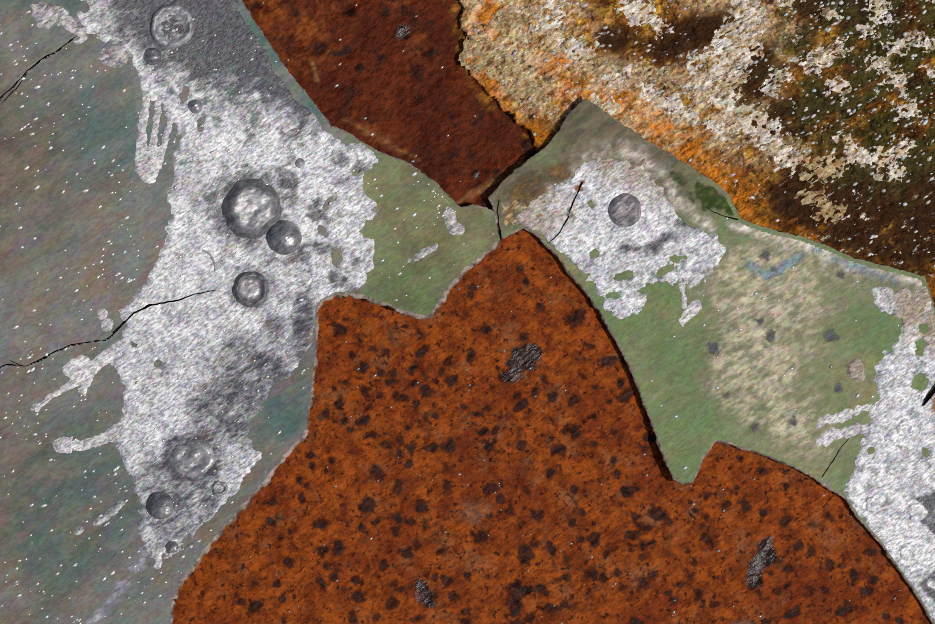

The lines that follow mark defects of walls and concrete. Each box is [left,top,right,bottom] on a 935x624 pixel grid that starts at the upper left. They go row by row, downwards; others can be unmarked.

crack [0,35,78,101]
crack [548,182,583,244]
crack [0,290,215,368]
water stain [566,143,924,461]
rust [323,345,458,468]
rust [490,333,558,412]
crack [922,387,935,406]
rust [358,497,428,536]
rust [625,506,672,560]
rust [746,537,793,598]
rust [373,574,470,624]
rust [505,579,570,624]